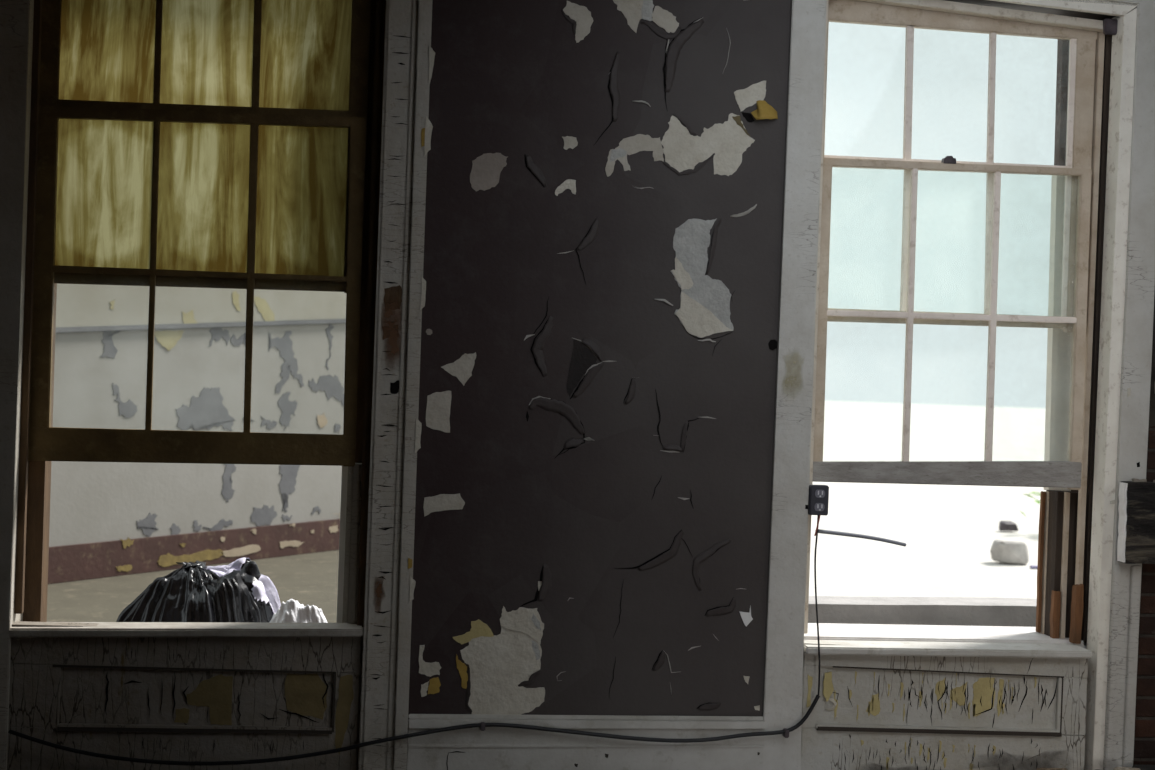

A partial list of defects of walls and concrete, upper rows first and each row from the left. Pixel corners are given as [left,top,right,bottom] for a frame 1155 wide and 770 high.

peeling [562,1,593,43]
peeling [613,0,681,55]
peeling [555,179,576,196]
peeling [562,136,578,150]
peeling [605,81,778,177]
peeling [655,204,757,356]
peeling [176,296,344,433]
peeling [120,464,314,567]
crack [520,297,743,693]
peeling [419,645,441,697]
peeling [453,606,545,715]
peeling [919,672,1013,719]